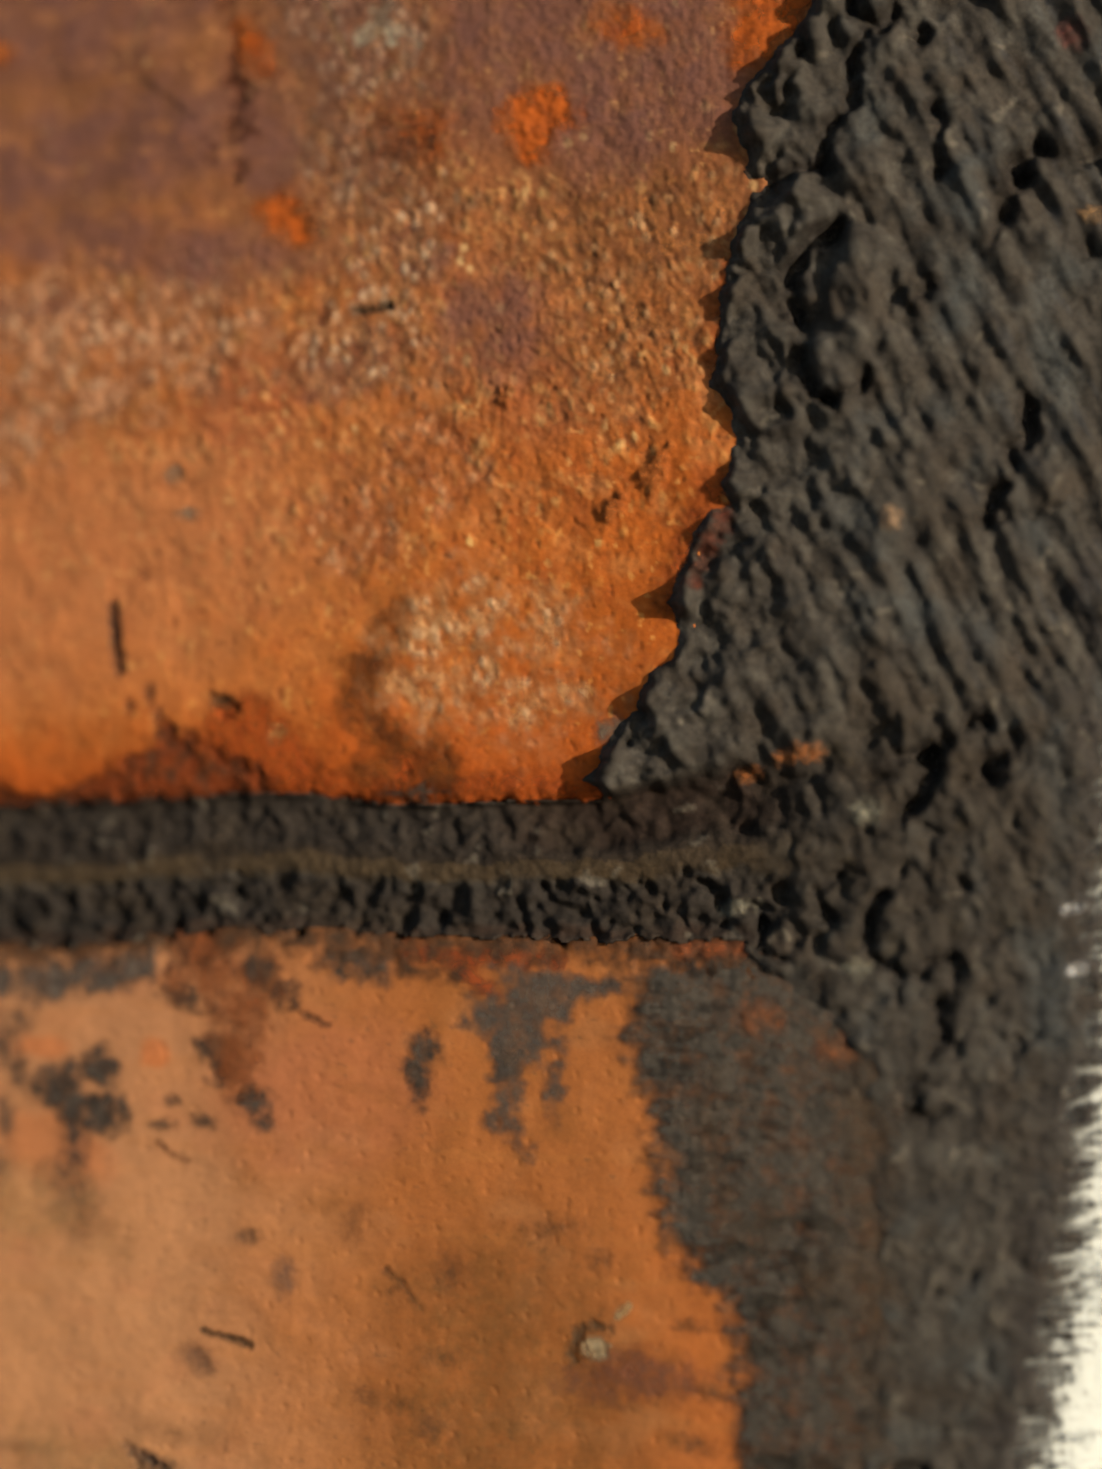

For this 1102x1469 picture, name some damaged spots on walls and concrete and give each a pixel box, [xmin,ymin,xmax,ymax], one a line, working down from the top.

spalling [201,1328,253,1348]
peeling [567,1321,611,1363]